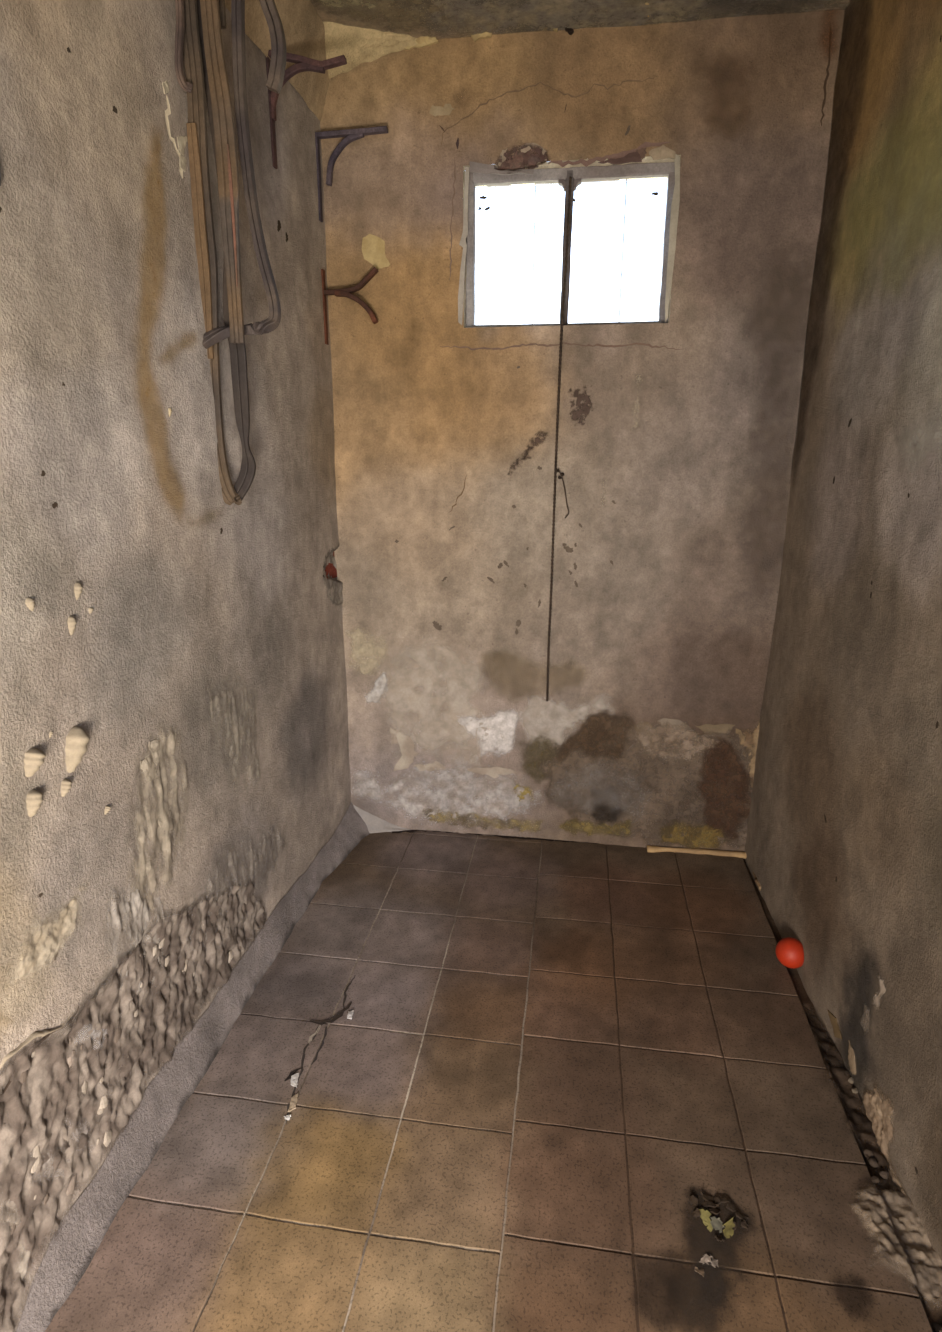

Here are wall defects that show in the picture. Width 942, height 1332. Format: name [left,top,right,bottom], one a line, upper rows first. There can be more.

water stain [314,0,849,35]
crack [439,76,657,279]
flaking render [458,125,680,325]
peeling [562,543,578,587]
peeling [743,722,760,788]
flaking render [0,730,285,1332]
crack [285,976,355,1123]
flaking render [863,1087,906,1196]